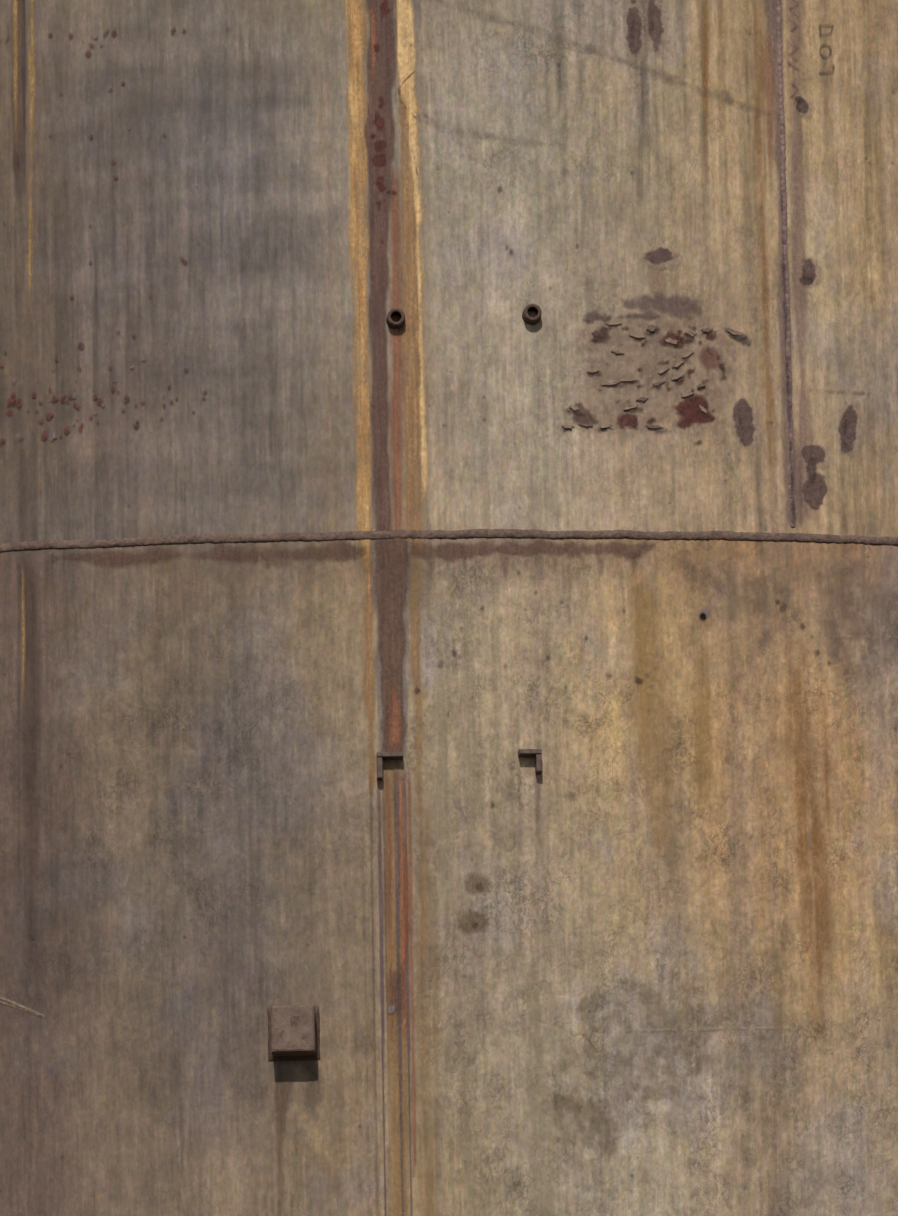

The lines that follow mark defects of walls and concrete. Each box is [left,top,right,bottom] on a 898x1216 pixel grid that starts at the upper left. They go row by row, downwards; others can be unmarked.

rust [626,0,666,58]
rust [758,0,809,519]
peeling [561,296,751,431]
rust [734,398,760,445]
rust [839,405,863,453]
rust [73,549,169,567]
rust [201,0,654,1216]